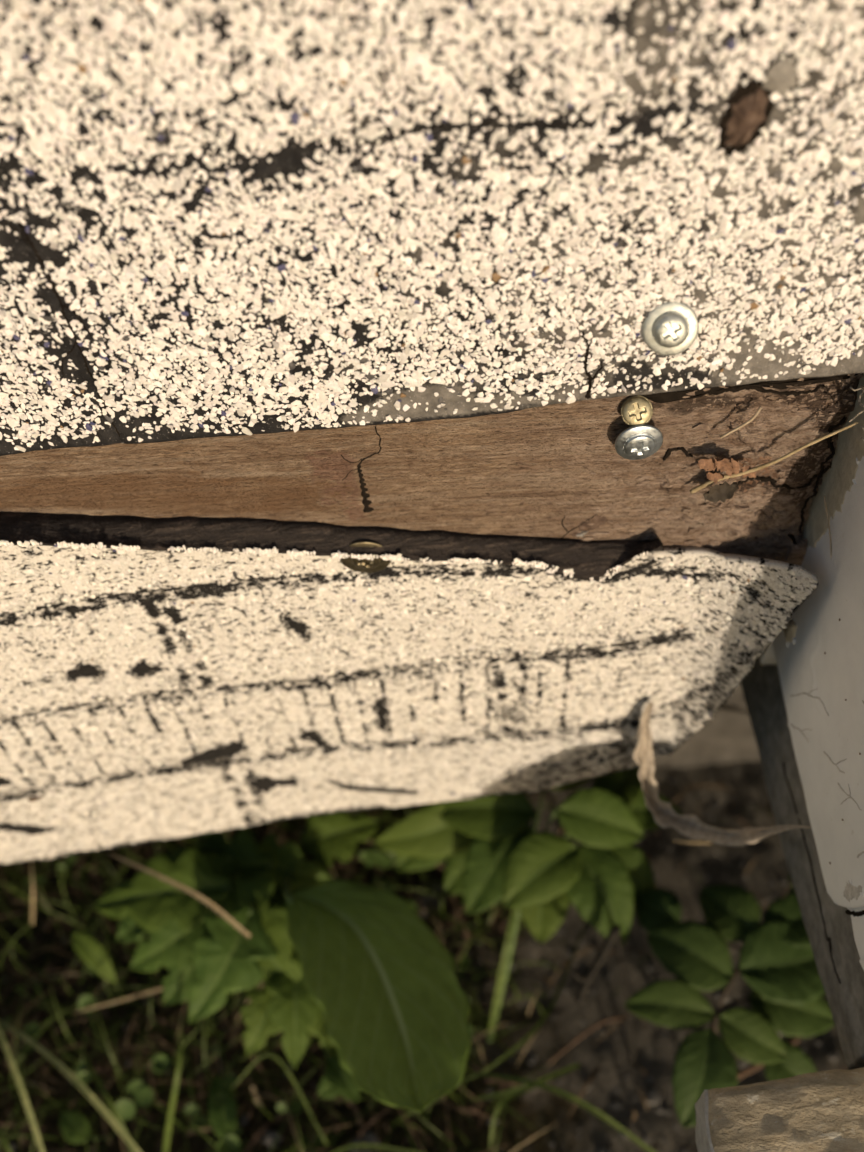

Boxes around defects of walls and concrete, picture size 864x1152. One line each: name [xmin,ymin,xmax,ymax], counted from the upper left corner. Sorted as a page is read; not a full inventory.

crack [341,426,381,512]
peeling [607,329,864,565]
crack [783,762,841,984]